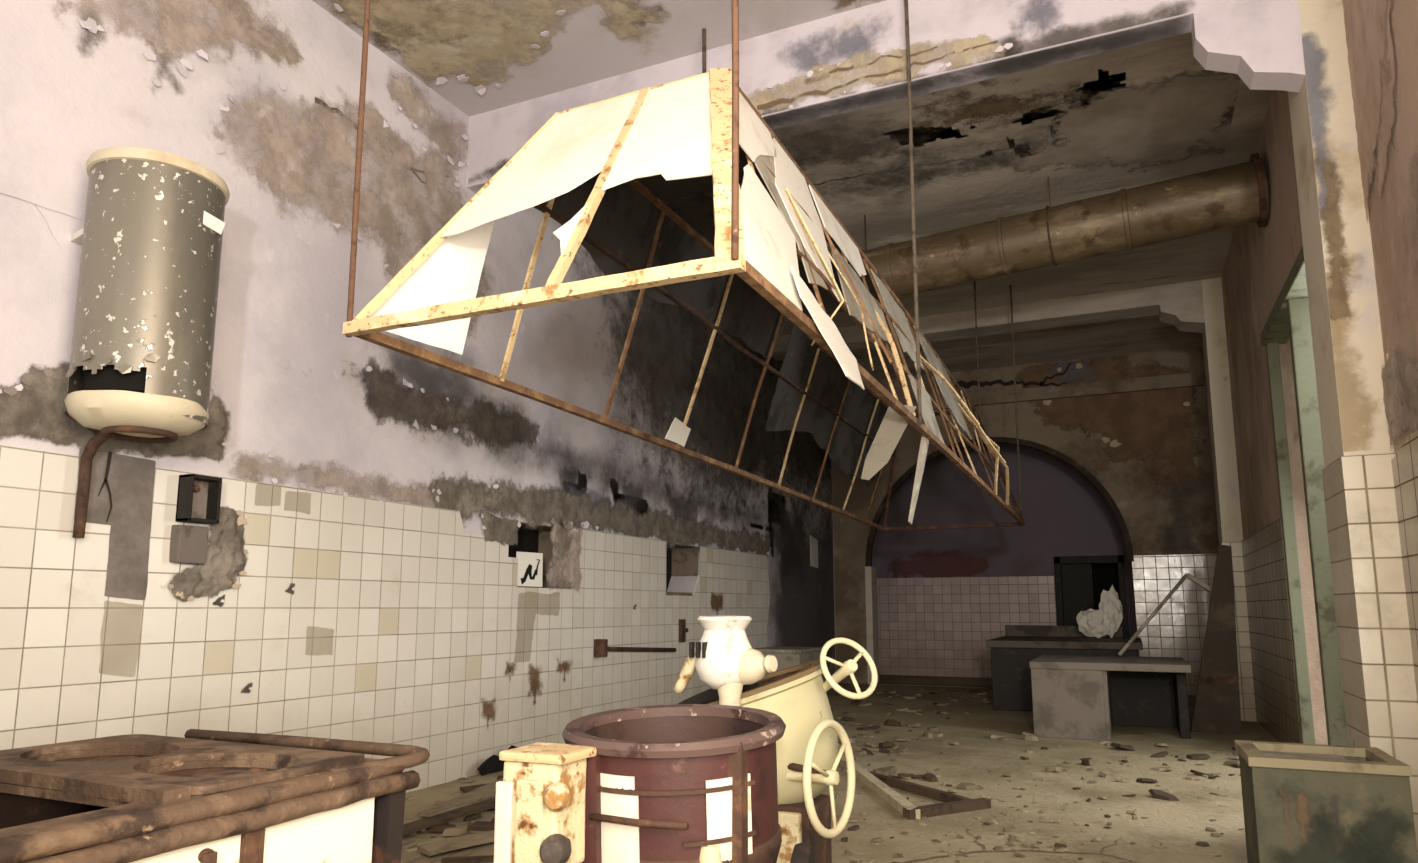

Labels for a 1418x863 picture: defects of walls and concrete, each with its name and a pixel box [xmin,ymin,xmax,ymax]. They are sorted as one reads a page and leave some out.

peeling [60,0,302,89]
spalling [214,0,592,277]
spalling [749,35,1013,118]
peeling [1015,71,1241,173]
damp [1302,35,1351,320]
spalling [476,268,488,298]
spalling [360,352,539,452]
spalling [0,363,230,600]
spalling [168,507,248,607]
peeling [235,451,770,591]